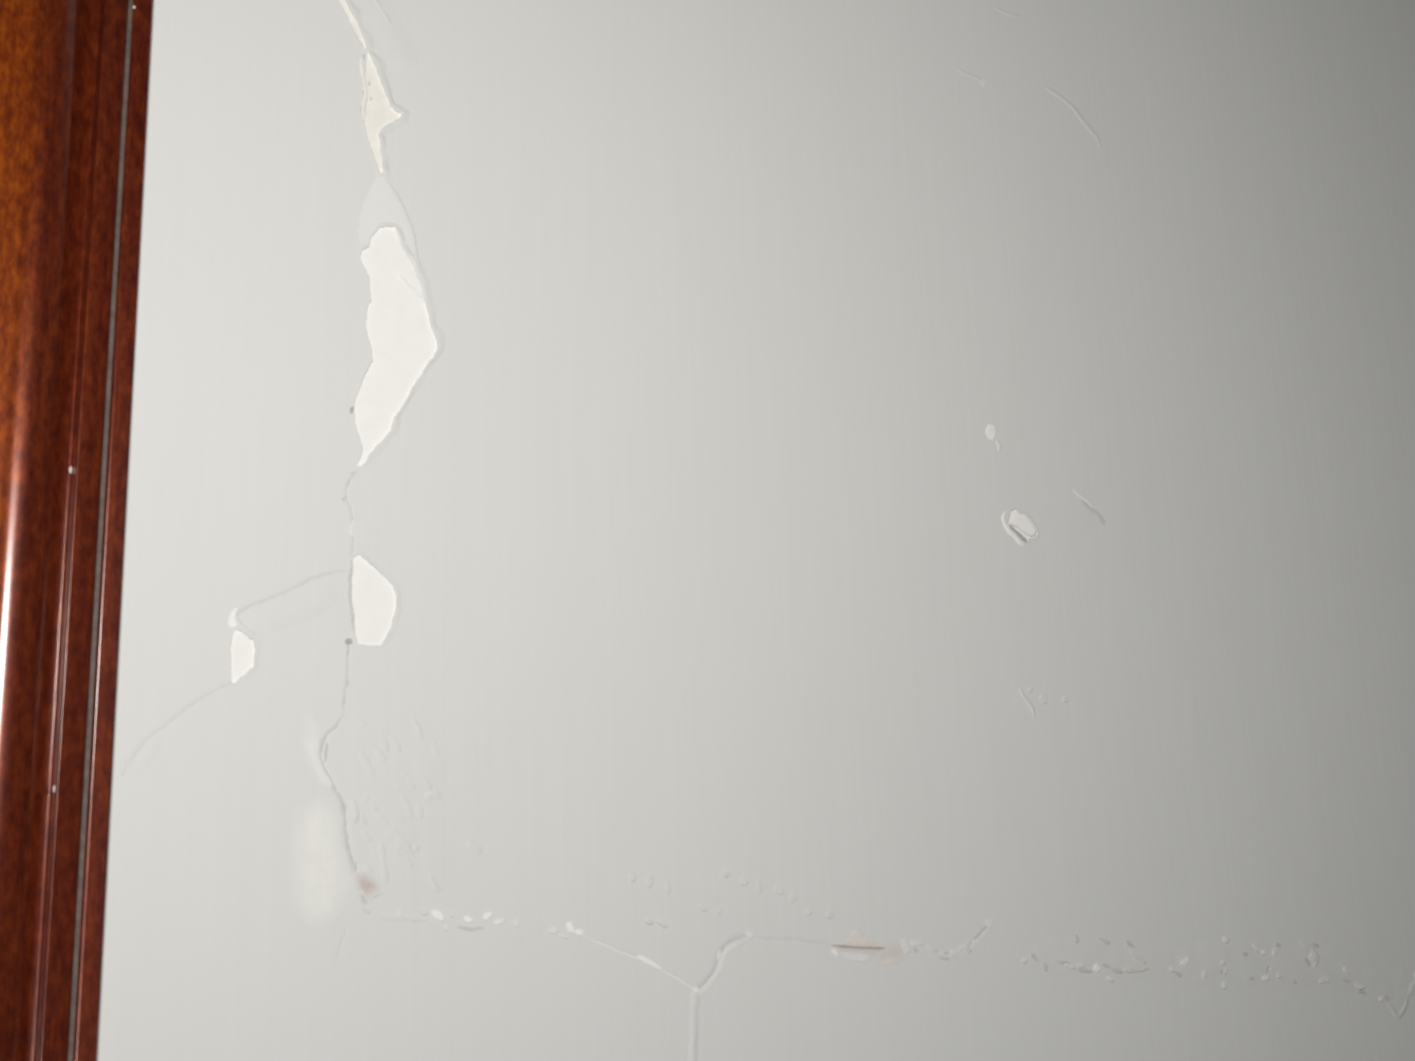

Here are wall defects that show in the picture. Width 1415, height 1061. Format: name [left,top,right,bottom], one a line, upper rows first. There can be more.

peeling [334,0,446,471]
peeling [1001,505,1040,546]
peeling [225,608,262,687]
peeling [345,549,402,650]
crack [308,644,373,962]